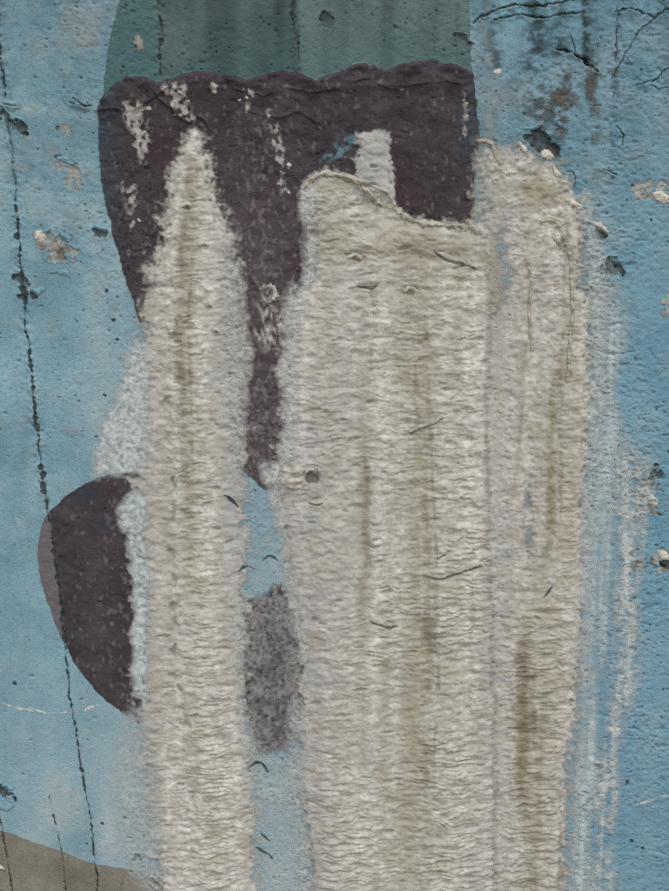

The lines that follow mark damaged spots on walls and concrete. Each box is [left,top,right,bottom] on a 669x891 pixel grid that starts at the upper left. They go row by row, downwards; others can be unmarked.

crack [479,1,597,71]
crack [615,8,669,67]
spalling [626,179,669,208]
spalling [34,230,80,277]
spalling [620,545,669,577]